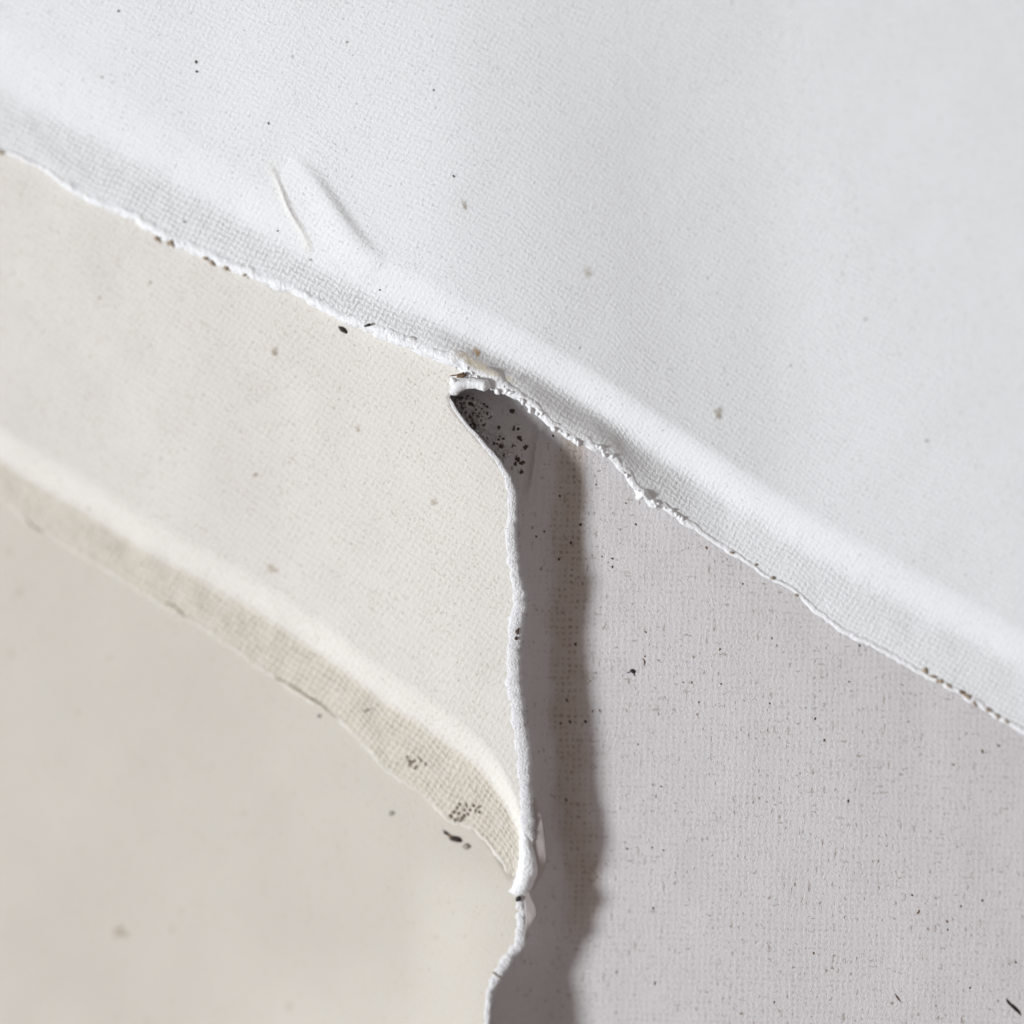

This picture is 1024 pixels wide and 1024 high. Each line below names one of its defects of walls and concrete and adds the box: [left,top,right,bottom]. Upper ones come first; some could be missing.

spalling [449,389,529,474]
peeling [443,802,482,843]